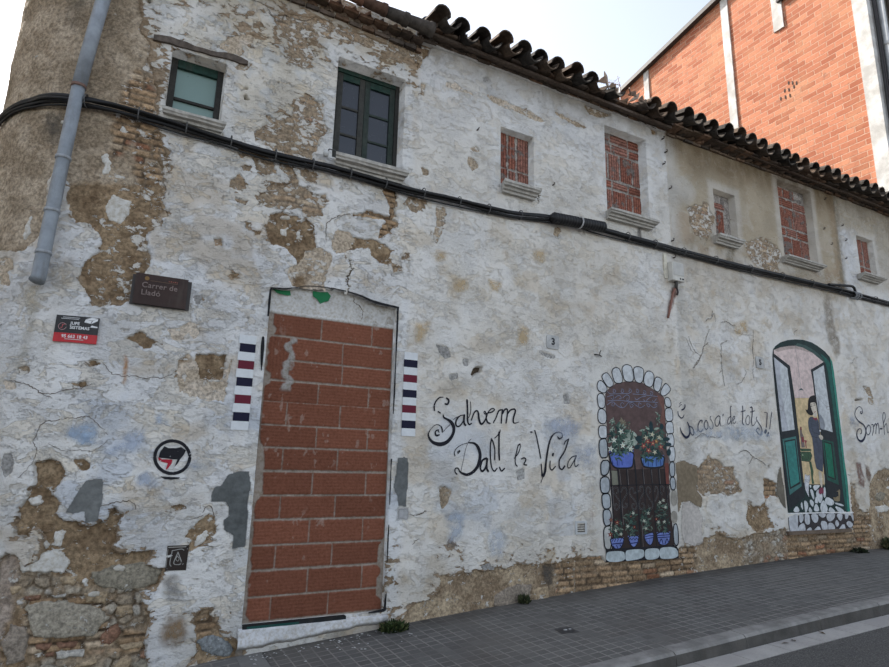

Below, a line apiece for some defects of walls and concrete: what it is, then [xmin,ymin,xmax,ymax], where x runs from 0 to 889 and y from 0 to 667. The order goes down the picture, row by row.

spalling [0,0,95,286]
spalling [66,0,171,306]
spalling [229,94,423,292]
spalling [744,238,781,272]
crack [687,311,754,386]
spalling [177,354,232,402]
spalling [1,453,15,478]
spalling [75,459,90,471]
spalling [696,455,740,496]
spalling [185,514,216,552]
spalling [403,469,889,624]